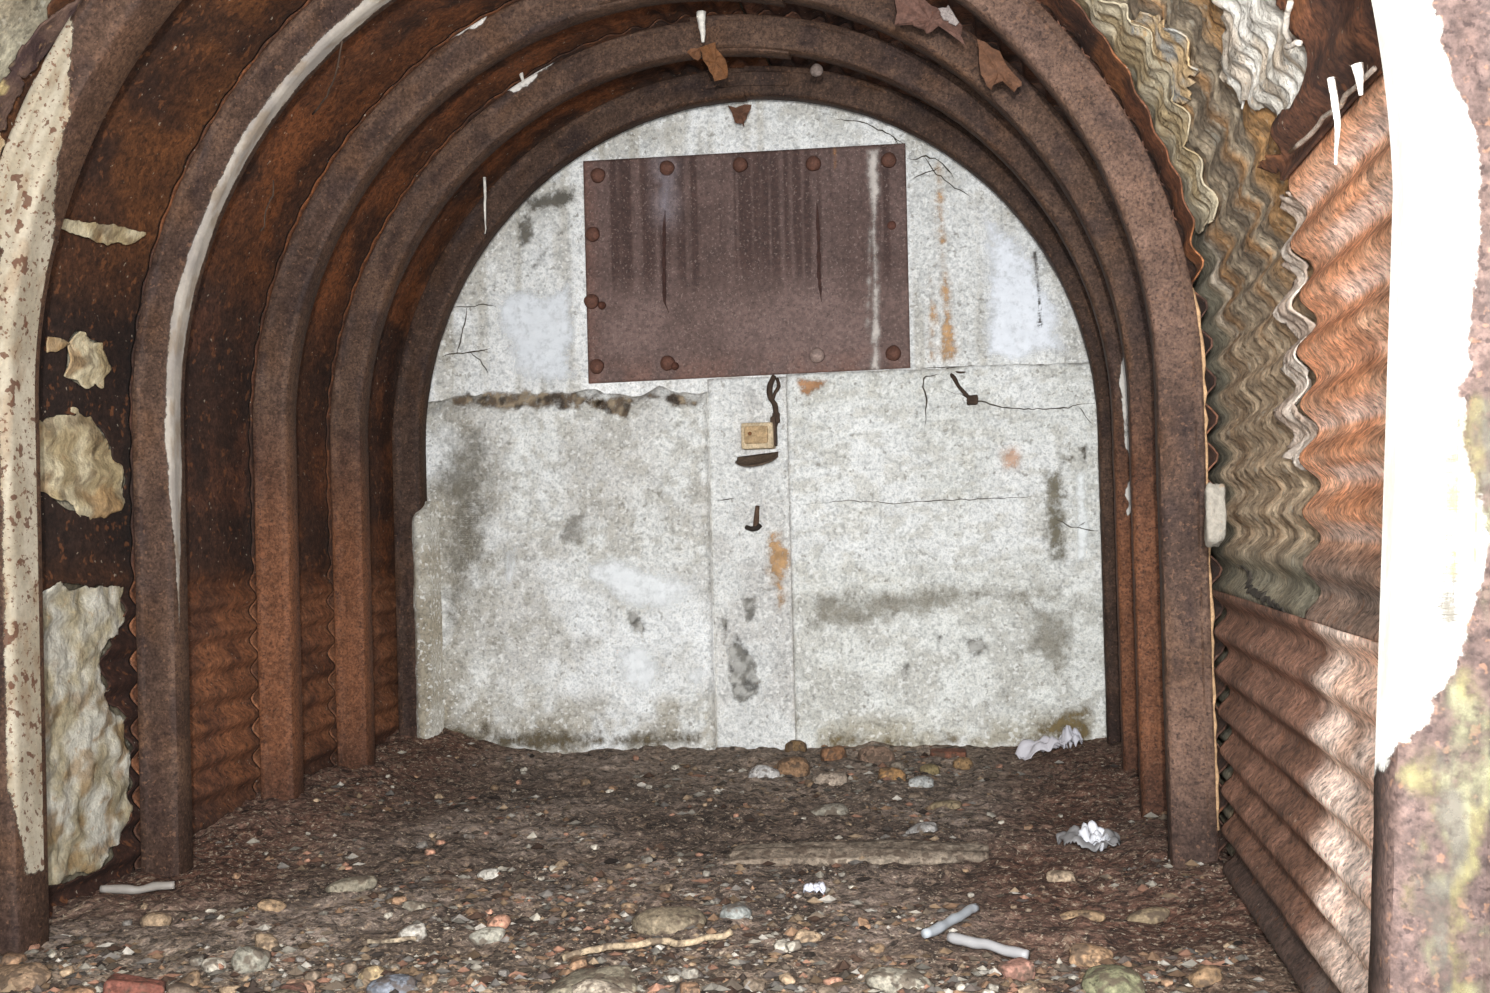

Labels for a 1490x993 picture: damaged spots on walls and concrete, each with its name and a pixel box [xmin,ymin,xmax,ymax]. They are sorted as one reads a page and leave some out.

peeling [1371,0,1490,775]
peeling [0,16,133,885]
damp [449,451,482,596]
damp [564,519,581,543]
damp [588,561,690,607]
corrosion [769,534,789,602]
damp [619,646,657,690]